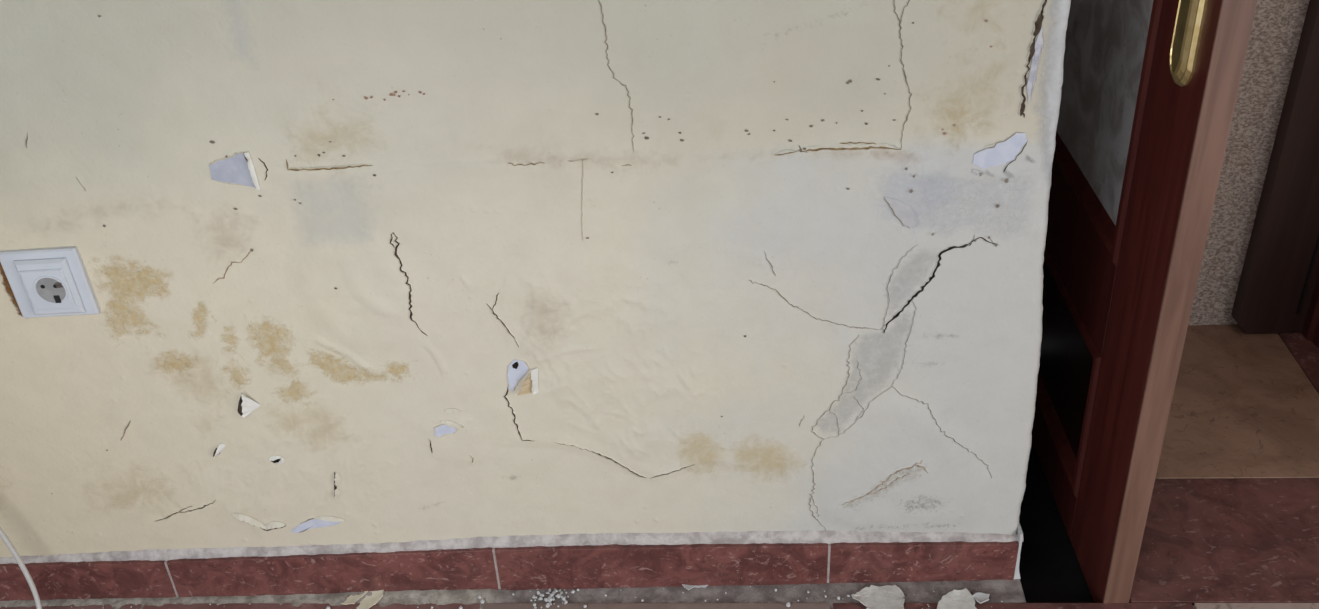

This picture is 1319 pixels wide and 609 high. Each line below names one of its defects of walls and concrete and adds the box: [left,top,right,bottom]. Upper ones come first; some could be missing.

crack [798,0,912,152]
peeling [972,0,1048,183]
peeling [209,152,269,191]
crack [286,159,373,171]
leakage [106,264,165,334]
crack [389,233,428,336]
peeling [237,393,261,420]
leakage [312,355,406,382]
crack [503,387,535,441]
peeling [506,358,539,396]
crack [748,235,996,531]
peeling [232,513,345,533]